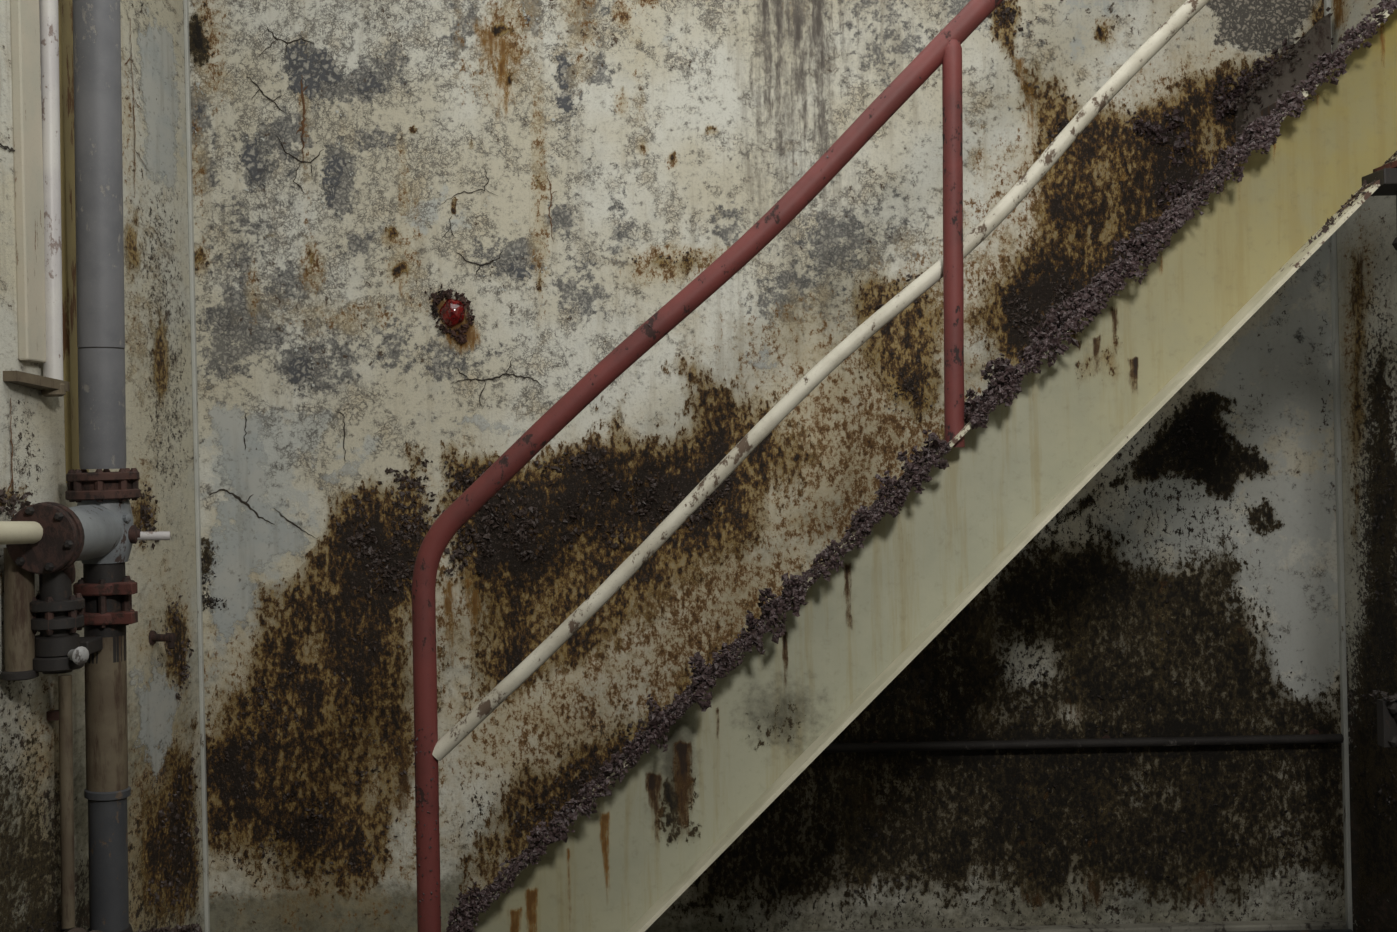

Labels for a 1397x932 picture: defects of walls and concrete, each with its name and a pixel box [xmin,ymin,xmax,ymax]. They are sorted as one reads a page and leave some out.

rust [491,23,514,37]
rust [967,0,1308,367]
rust [1072,307,1138,389]
mould [0,721,66,932]
crack [209,489,318,539]
rust [205,440,500,900]
rust [452,601,763,905]
rust [436,351,823,713]
mould [669,347,1397,930]